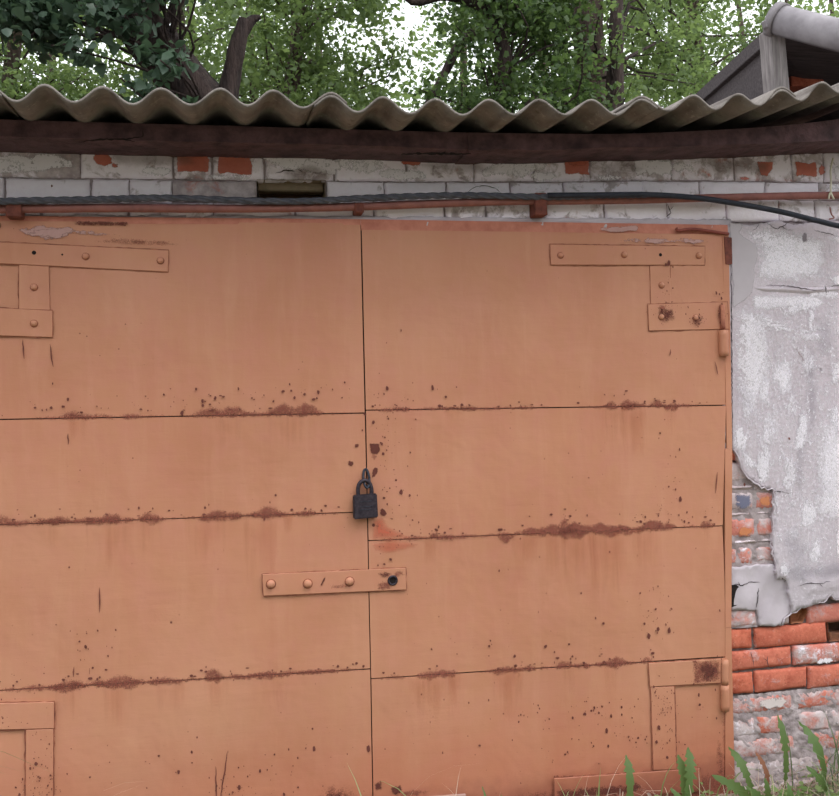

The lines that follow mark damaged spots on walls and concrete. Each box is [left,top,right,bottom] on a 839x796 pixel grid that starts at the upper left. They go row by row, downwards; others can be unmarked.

crack [766,285,839,293]
rust [198,397,320,417]
rust [372,401,542,411]
rust [589,390,693,411]
peeling [732,227,839,578]
rust [0,506,174,526]
rust [188,494,327,521]
rust [405,509,715,543]
rust [495,652,654,674]
rust [7,662,365,693]
flaking render [731,585,839,790]
rust [558,783,641,796]